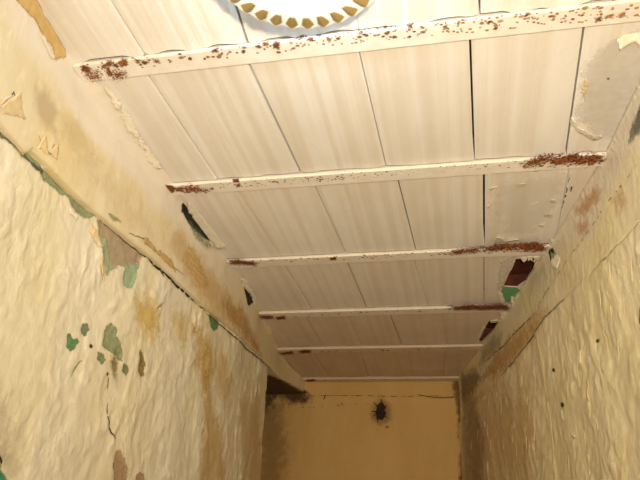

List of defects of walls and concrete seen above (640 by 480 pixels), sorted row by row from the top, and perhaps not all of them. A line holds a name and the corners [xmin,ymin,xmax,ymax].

flaking render [17,0,66,60]
corrosion [256,25,397,54]
corrosion [509,4,640,29]
corrosion [81,55,159,82]
corrosion [498,152,606,169]
flaking render [0,132,143,288]
flaking render [181,202,225,250]
corrosion [425,241,549,256]
flaking render [478,256,539,341]
peeling [89,323,129,378]
mould [265,375,309,406]
leakage [371,399,387,423]